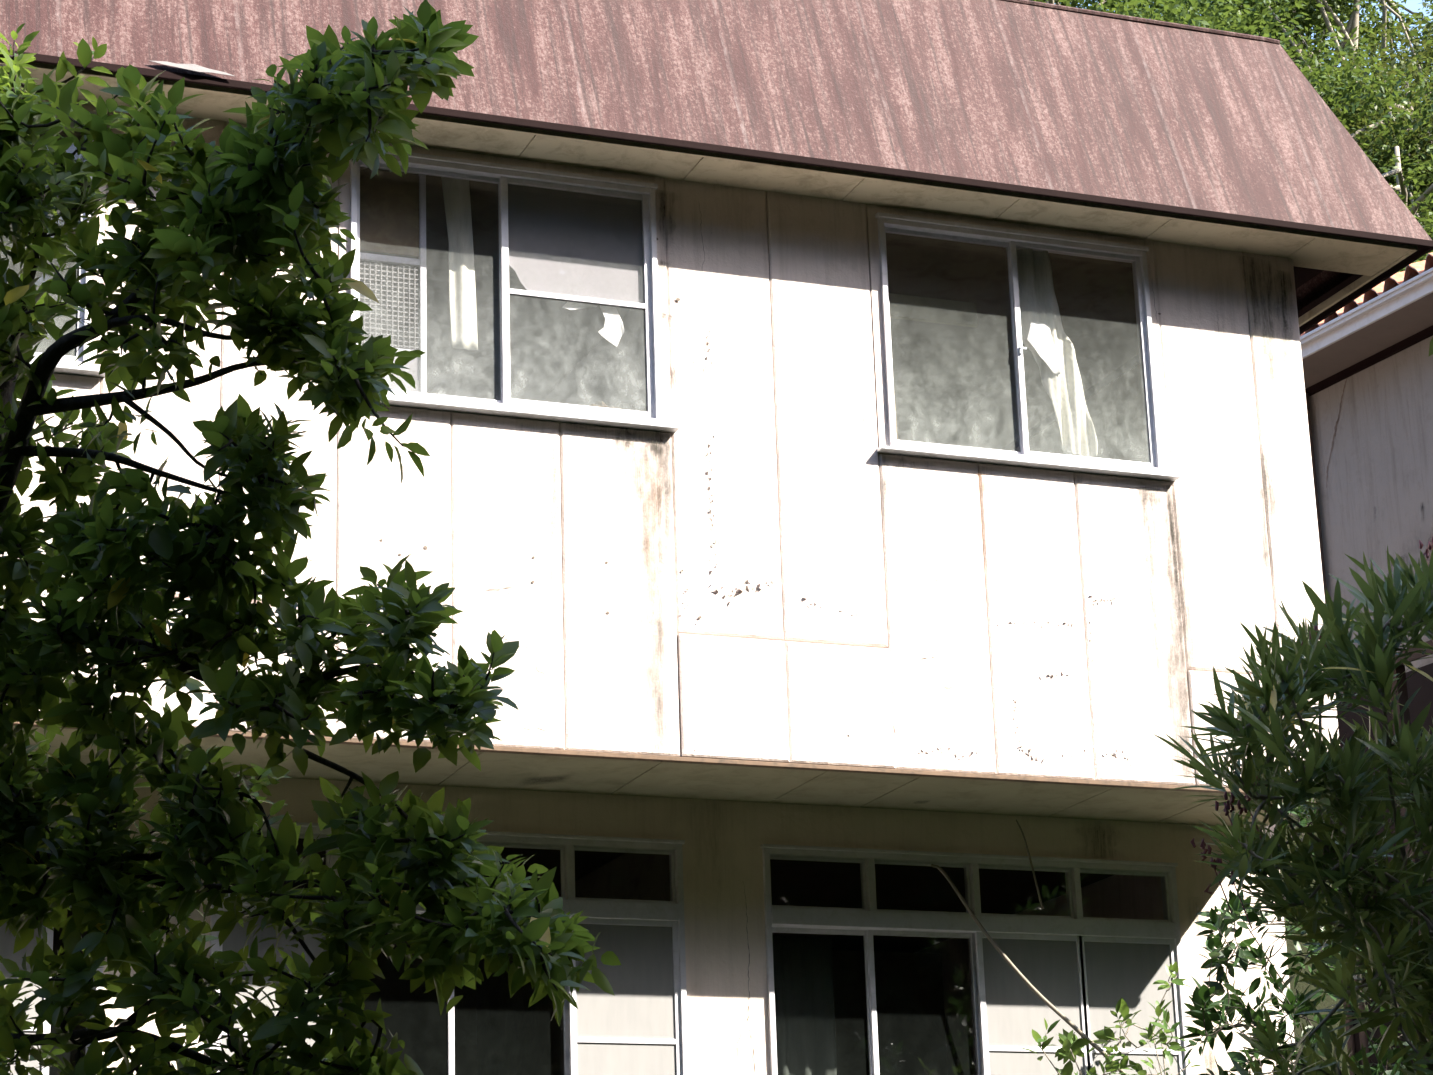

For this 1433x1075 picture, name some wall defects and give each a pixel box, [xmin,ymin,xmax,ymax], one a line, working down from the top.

water stain [645,440,664,560]
water stain [1263,455,1271,560]
water stain [1143,489,1187,662]